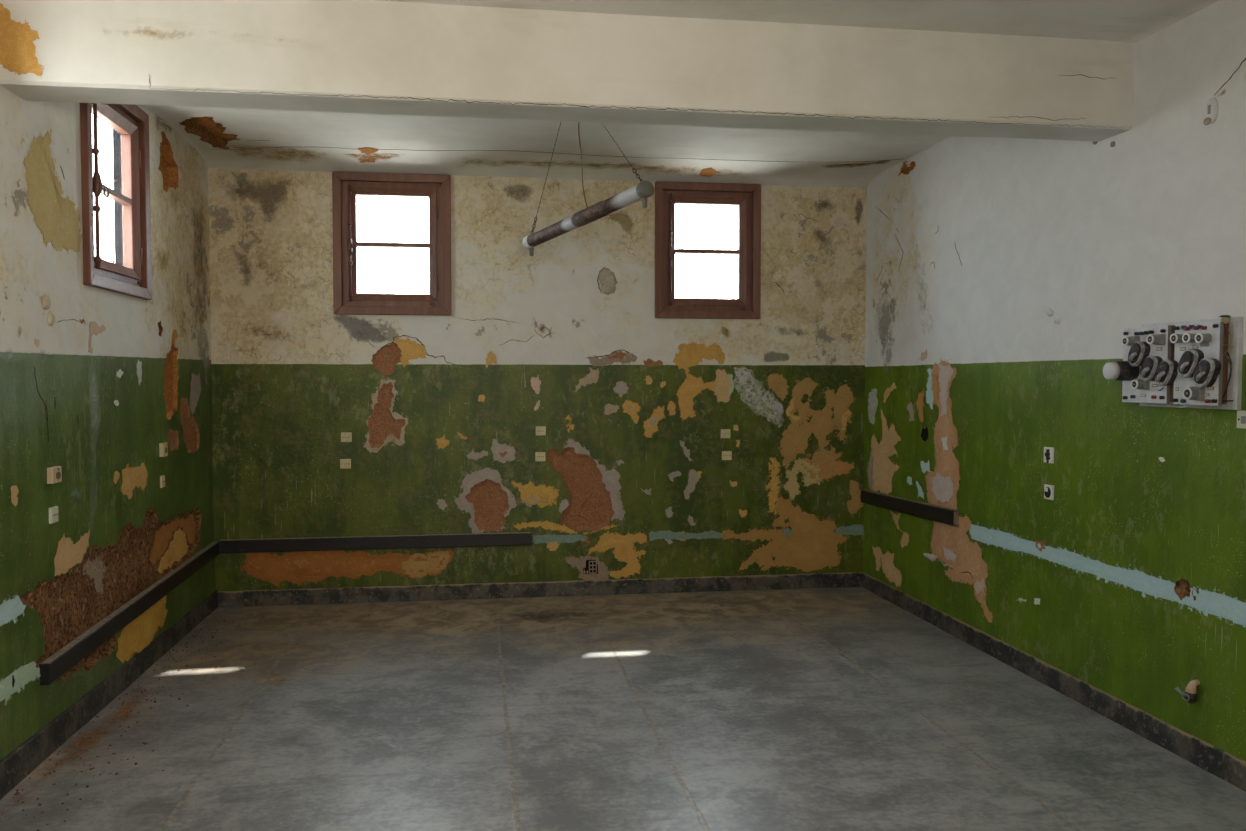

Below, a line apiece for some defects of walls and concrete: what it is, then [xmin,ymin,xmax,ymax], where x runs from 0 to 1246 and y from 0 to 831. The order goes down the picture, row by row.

peeling [0,3,44,78]
spalling [179,116,241,149]
leakage [236,182,285,216]
leakage [505,186,530,199]
leakage [336,315,385,342]
peeling [575,342,735,438]
leakage [764,352,789,362]
spalling [436,432,538,533]
spalling [547,438,649,580]
spalling [719,349,1246,628]
spalling [0,506,202,705]
peeling [239,549,456,588]